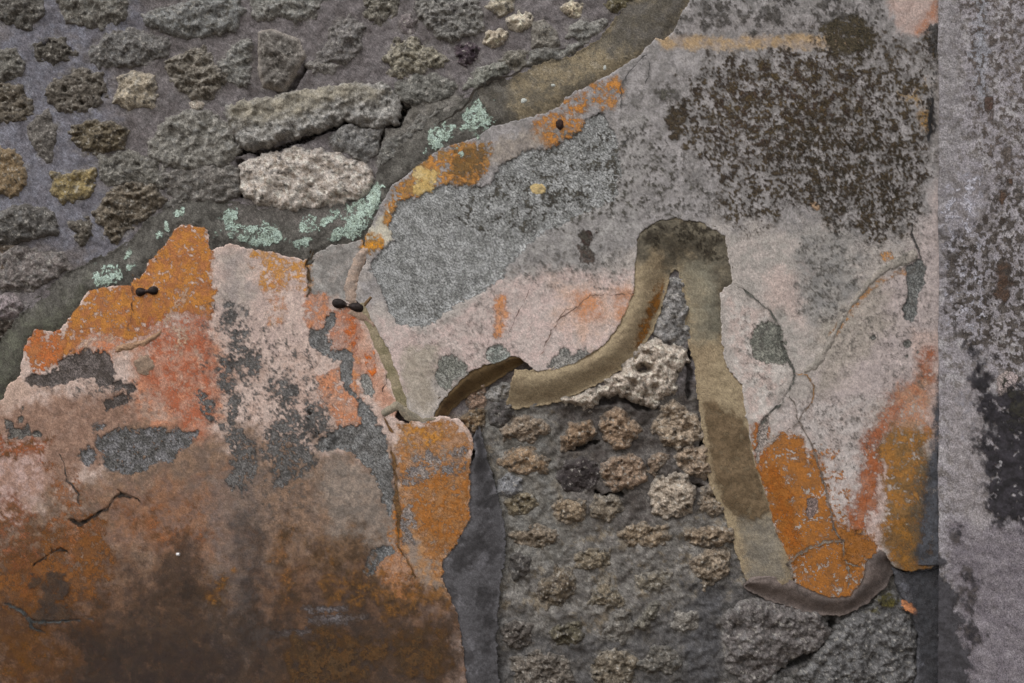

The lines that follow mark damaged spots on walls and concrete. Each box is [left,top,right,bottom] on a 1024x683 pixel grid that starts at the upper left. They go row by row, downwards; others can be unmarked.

spalling [369,113,622,328]
spalling [486,344,510,364]
spalling [547,347,590,369]
crack [737,286,861,589]
crack [59,454,140,527]
crack [33,547,68,566]